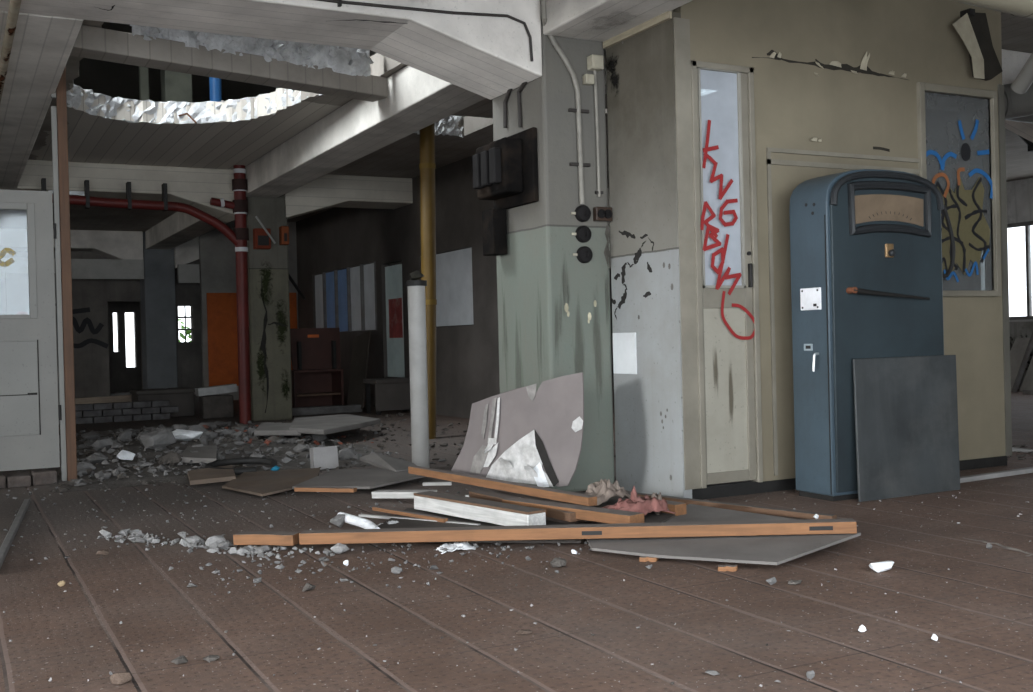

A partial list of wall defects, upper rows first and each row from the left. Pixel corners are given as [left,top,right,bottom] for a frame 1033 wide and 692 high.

spalling [130,24,374,76]
spalling [66,84,301,124]
crack [965,538,1033,556]